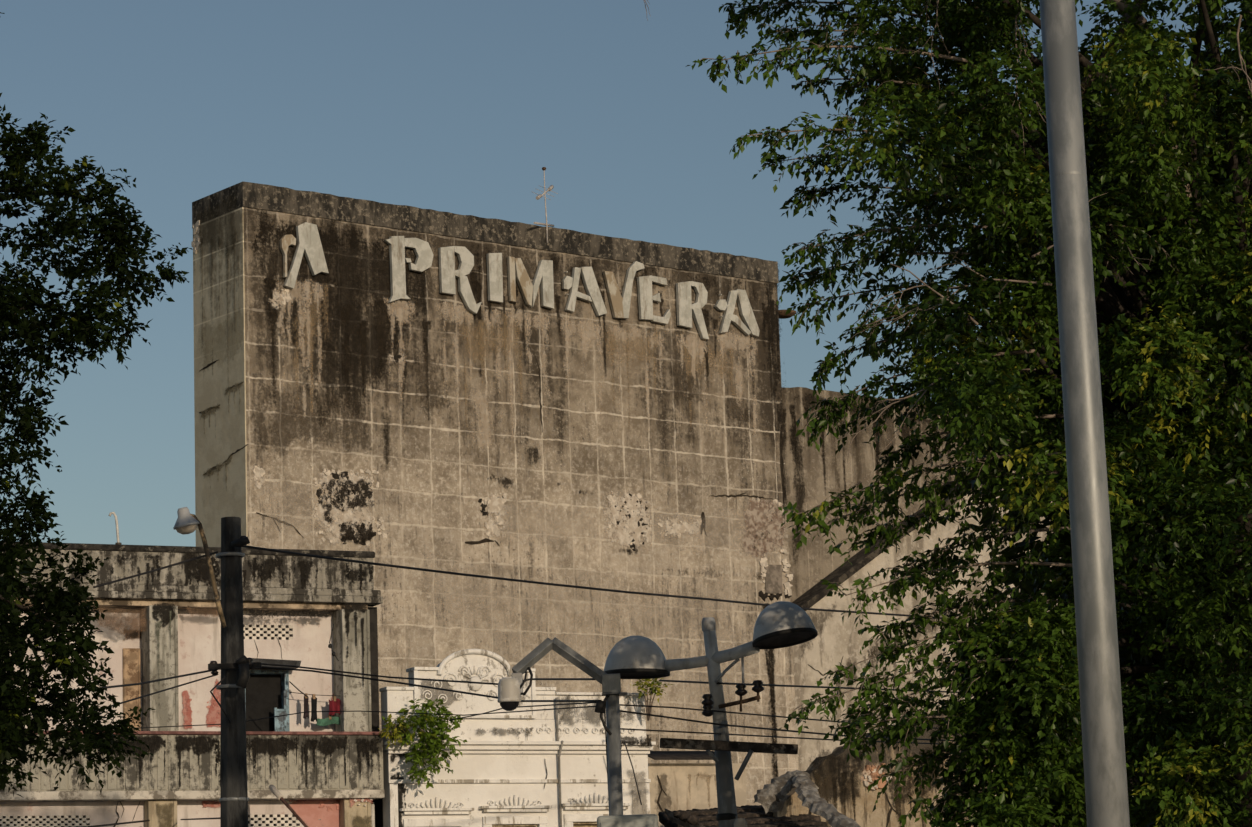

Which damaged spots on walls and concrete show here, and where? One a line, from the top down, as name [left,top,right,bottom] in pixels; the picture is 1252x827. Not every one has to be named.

damp [201,383,242,434]
damp [252,209,826,555]
damp [204,454,232,488]
damp [837,401,937,505]
peeling [310,465,387,547]
peeling [478,493,507,537]
peeling [604,490,707,552]
damp [243,555,318,589]
damp [249,609,330,619]
damp [344,563,374,687]
damp [765,649,778,777]
damp [97,736,221,787]